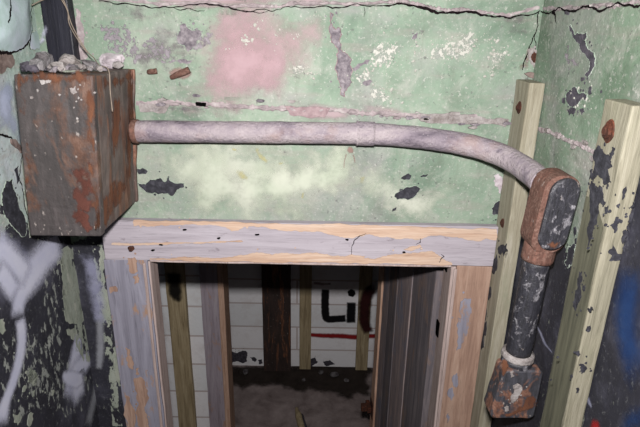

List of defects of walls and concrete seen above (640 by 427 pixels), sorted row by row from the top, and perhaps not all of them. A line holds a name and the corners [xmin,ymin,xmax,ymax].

spalling [136,12,511,129]
crack [99,0,640,70]
peeling [562,10,597,116]
peeling [137,168,187,199]
peeling [391,173,428,200]
peeling [133,218,508,274]
peeling [561,226,577,271]
peeling [572,271,594,316]
peeling [0,246,90,427]